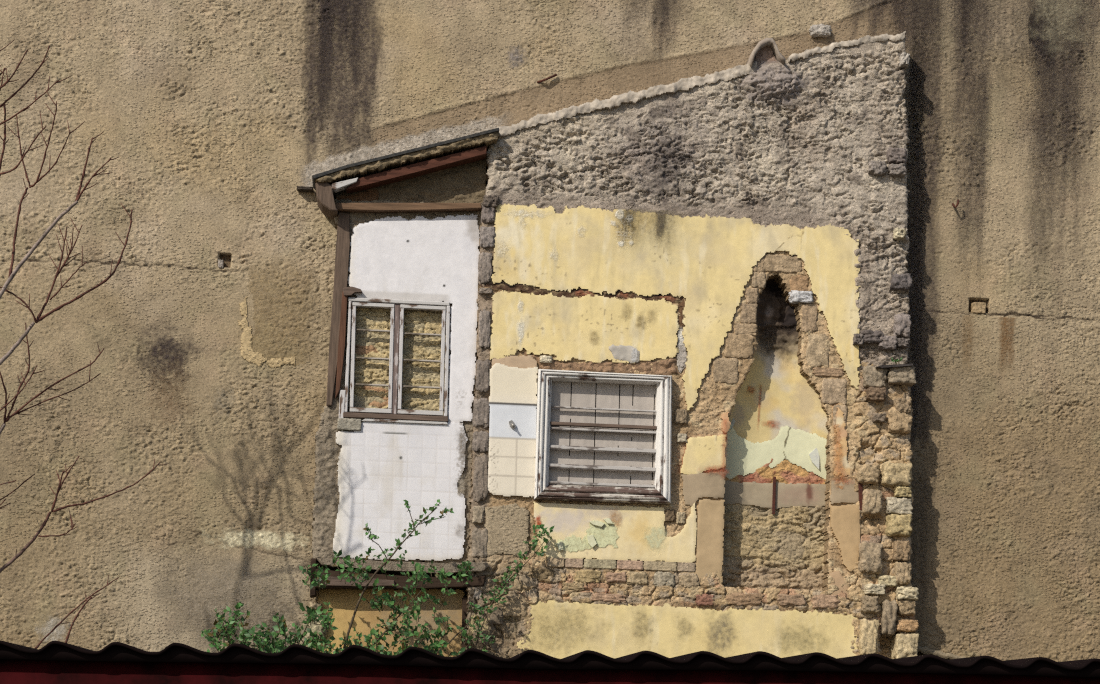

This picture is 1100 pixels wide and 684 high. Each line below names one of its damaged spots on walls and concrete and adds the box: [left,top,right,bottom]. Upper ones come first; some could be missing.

water stain [304,0,380,159]
water stain [855,0,941,442]
spalling [518,324,679,375]
peeling [723,418,827,485]